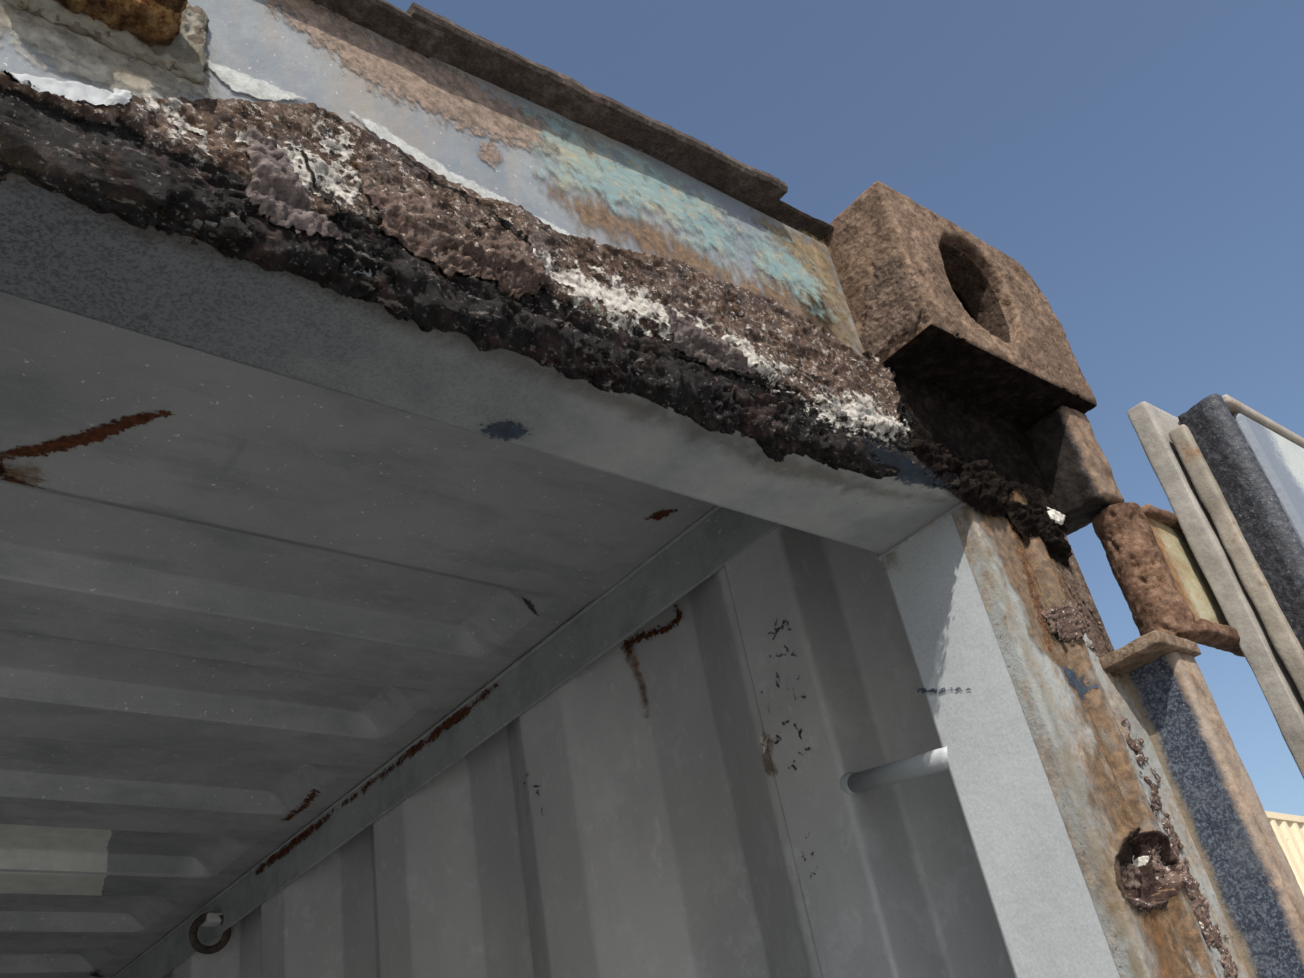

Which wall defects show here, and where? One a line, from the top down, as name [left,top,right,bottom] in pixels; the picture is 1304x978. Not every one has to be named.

rust [11,72,132,107]
rust [244,123,343,241]
rust [361,175,557,300]
peeling [266,0,837,319]
rust [551,188,864,354]
rust [663,305,755,375]
rust [0,410,173,489]
rust [621,604,684,704]
rust [980,497,1238,978]